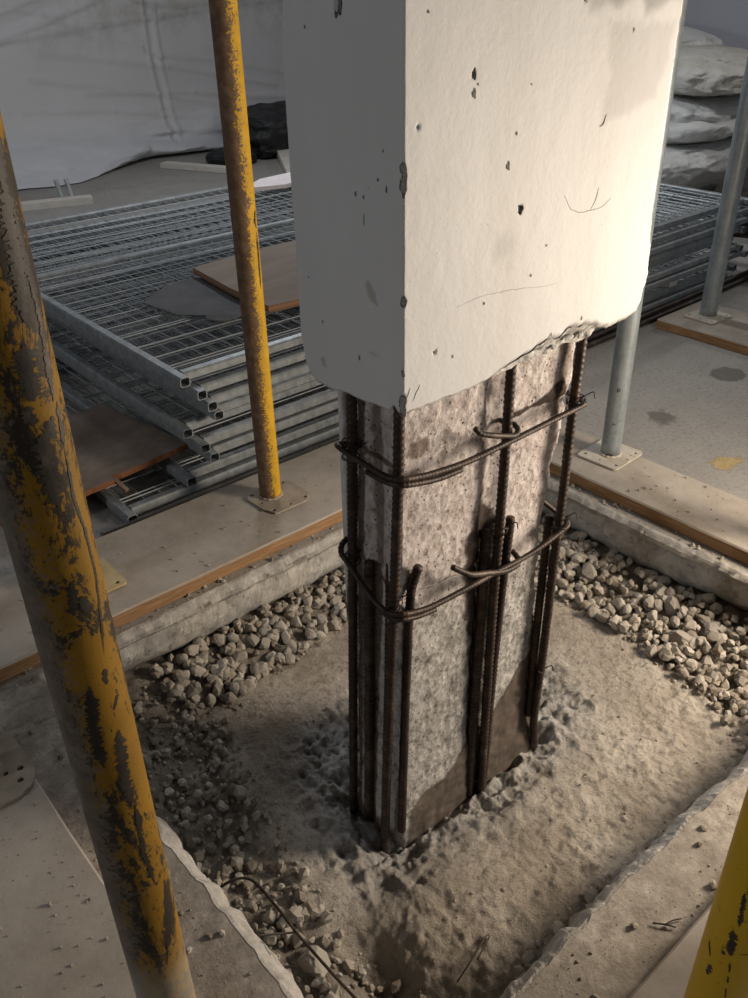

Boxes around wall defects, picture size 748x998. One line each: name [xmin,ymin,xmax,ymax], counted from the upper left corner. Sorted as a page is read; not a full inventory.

rust [513,378,566,418]
rust [464,443,495,736]